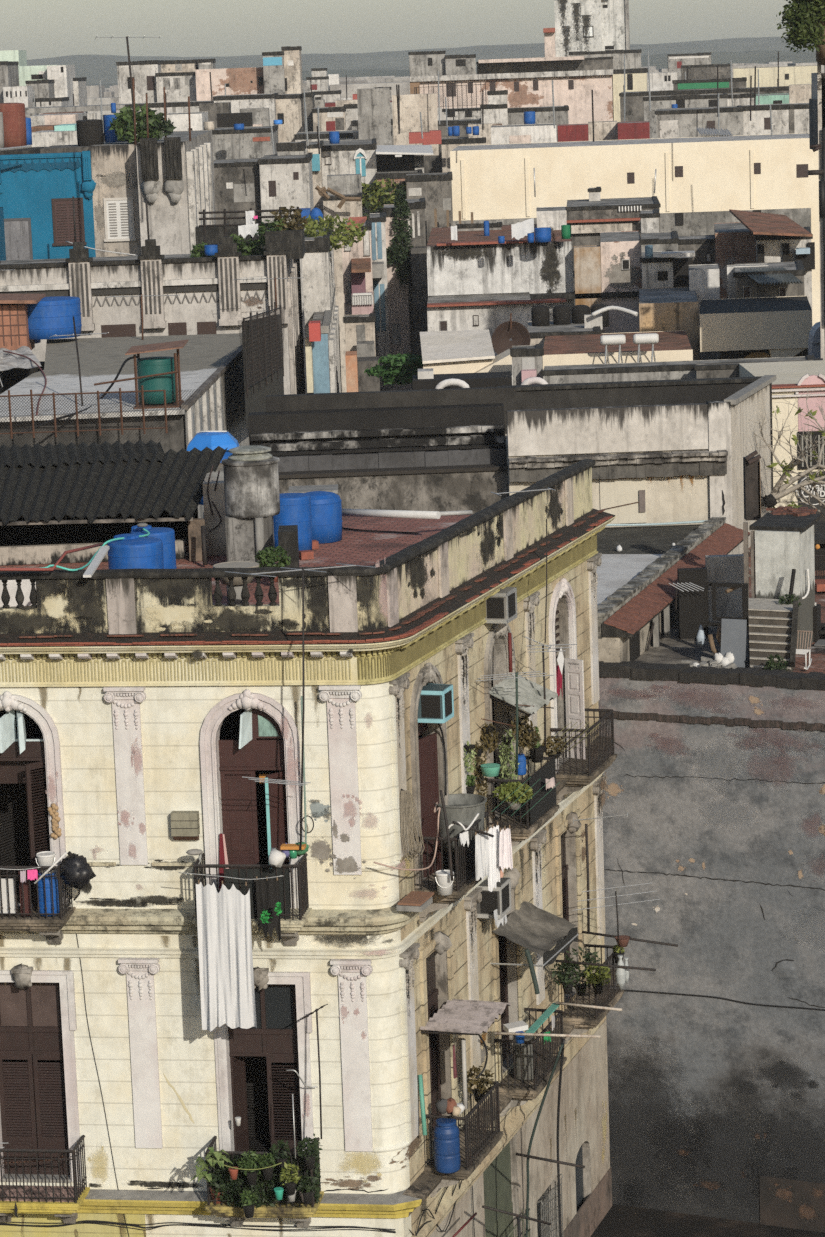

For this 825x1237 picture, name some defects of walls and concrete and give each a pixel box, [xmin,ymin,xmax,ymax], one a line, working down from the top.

damp [442,245,488,261]
damp [540,226,560,293]
damp [545,483,563,531]
damp [460,514,504,566]
damp [0,579,106,634]
damp [356,576,373,611]
damp [408,547,438,599]
peeling [131,739,142,774]
peeling [118,811,146,857]
spalling [309,795,366,873]
damp [770,1061,818,1098]
damp [609,1070,825,1207]